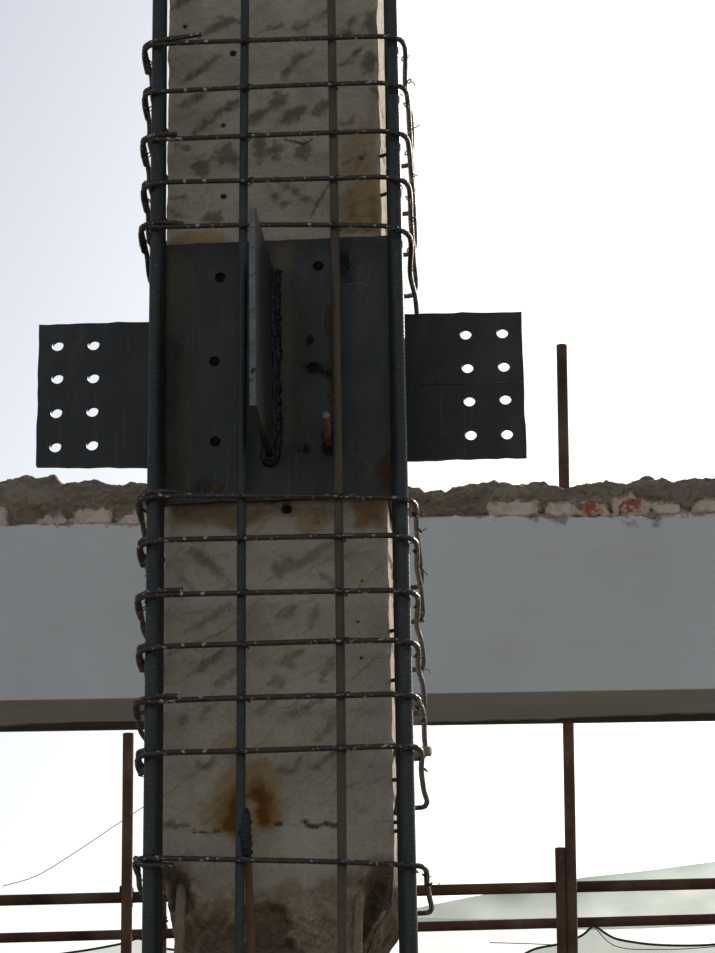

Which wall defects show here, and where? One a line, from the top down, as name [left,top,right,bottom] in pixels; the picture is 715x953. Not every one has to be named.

rust [343,181,381,229]
spalling [36,0,418,953]
flaking render [0,507,9,526]
flaking render [486,492,715,518]
rust [209,764,281,830]